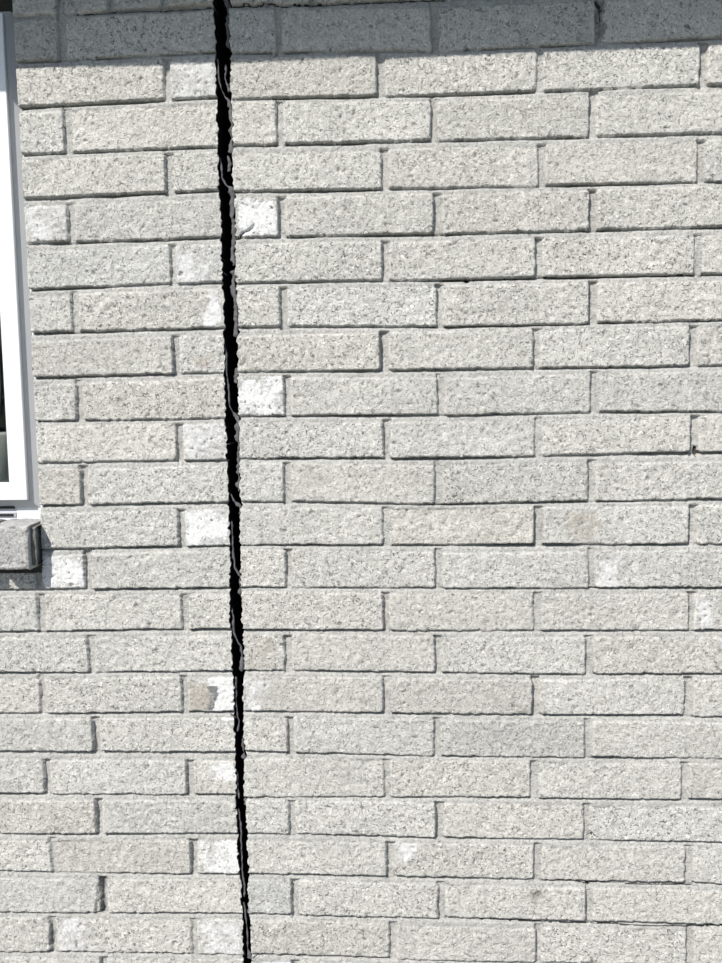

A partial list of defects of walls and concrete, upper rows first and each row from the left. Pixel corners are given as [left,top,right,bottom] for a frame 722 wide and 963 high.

crack [75,0,444,963]